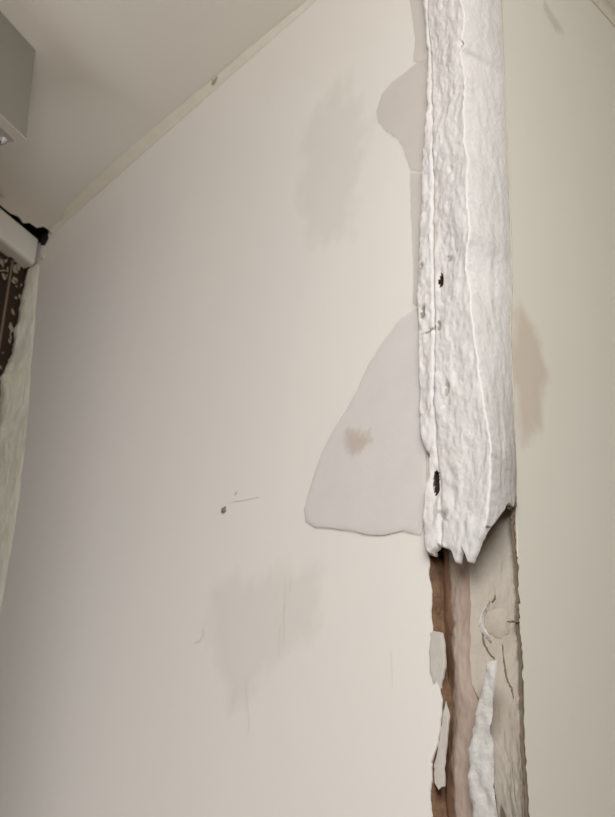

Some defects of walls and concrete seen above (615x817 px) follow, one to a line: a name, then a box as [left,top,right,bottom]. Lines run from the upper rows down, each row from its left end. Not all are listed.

spalling [429,506,525,817]